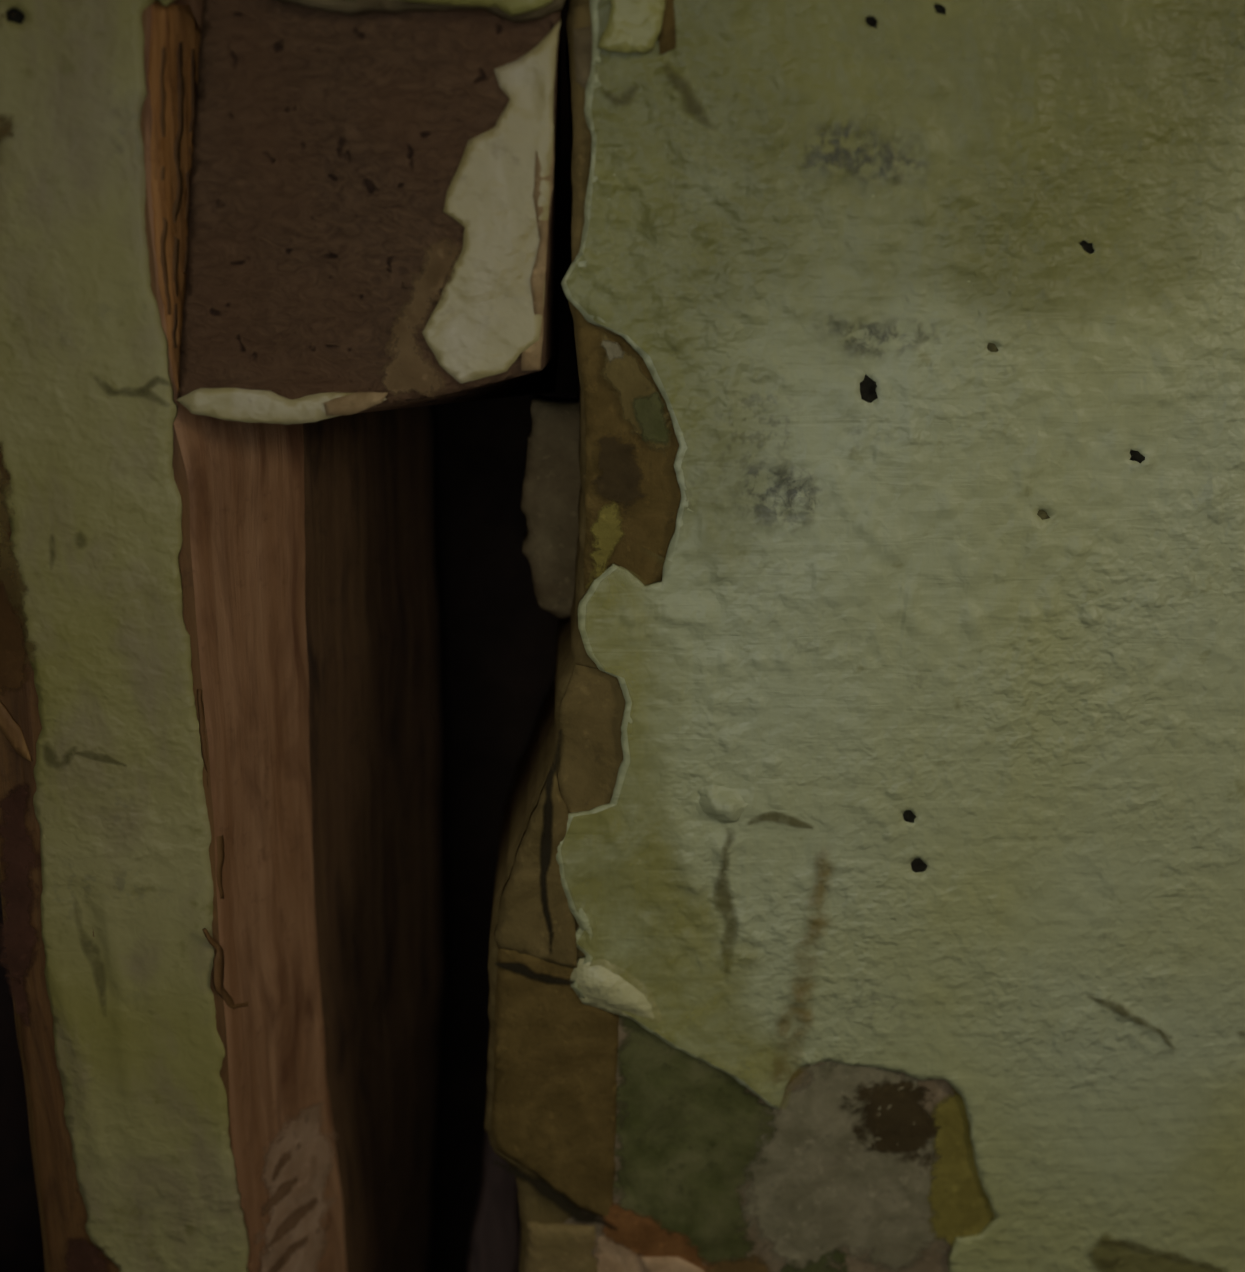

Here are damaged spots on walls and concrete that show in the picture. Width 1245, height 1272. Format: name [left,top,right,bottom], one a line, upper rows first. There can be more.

peeling [277,0,676,384]
peeling [0,447,35,762]
peeling [324,392,388,416]
peeling [521,306,681,618]
peeling [491,664,994,1272]
peeling [1092,1236,1222,1272]